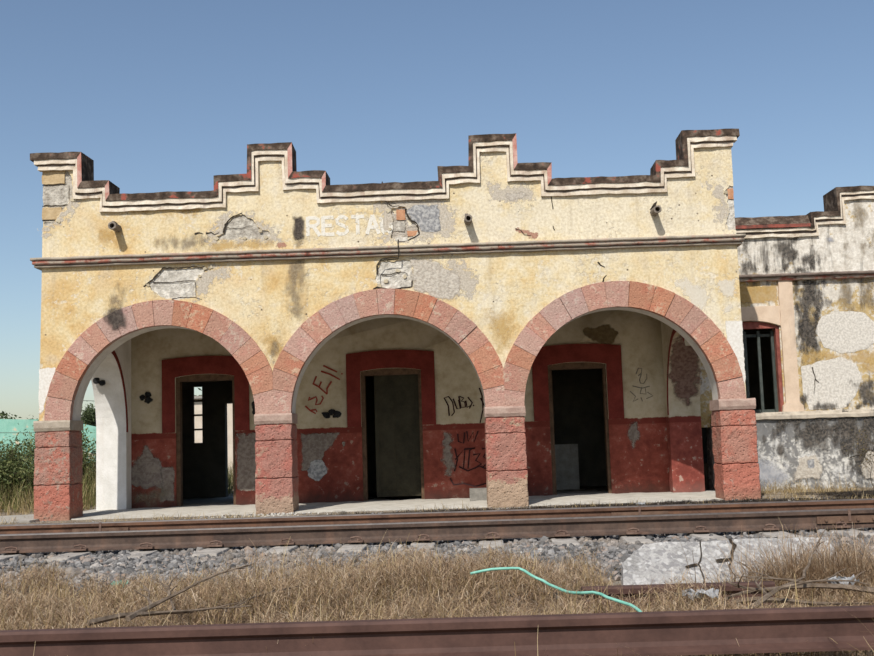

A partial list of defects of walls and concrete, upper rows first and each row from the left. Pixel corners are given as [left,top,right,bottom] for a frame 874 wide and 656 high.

spalling [42,171,76,227]
spalling [194,213,287,248]
spalling [386,207,420,242]
damp [104,297,125,330]
spalling [143,265,213,300]
flaking render [373,258,460,299]
damp [740,285,777,303]
peeling [668,336,702,406]
damp [763,237,874,474]
peeling [131,445,175,501]
peeling [236,433,257,491]
peeling [301,433,345,481]